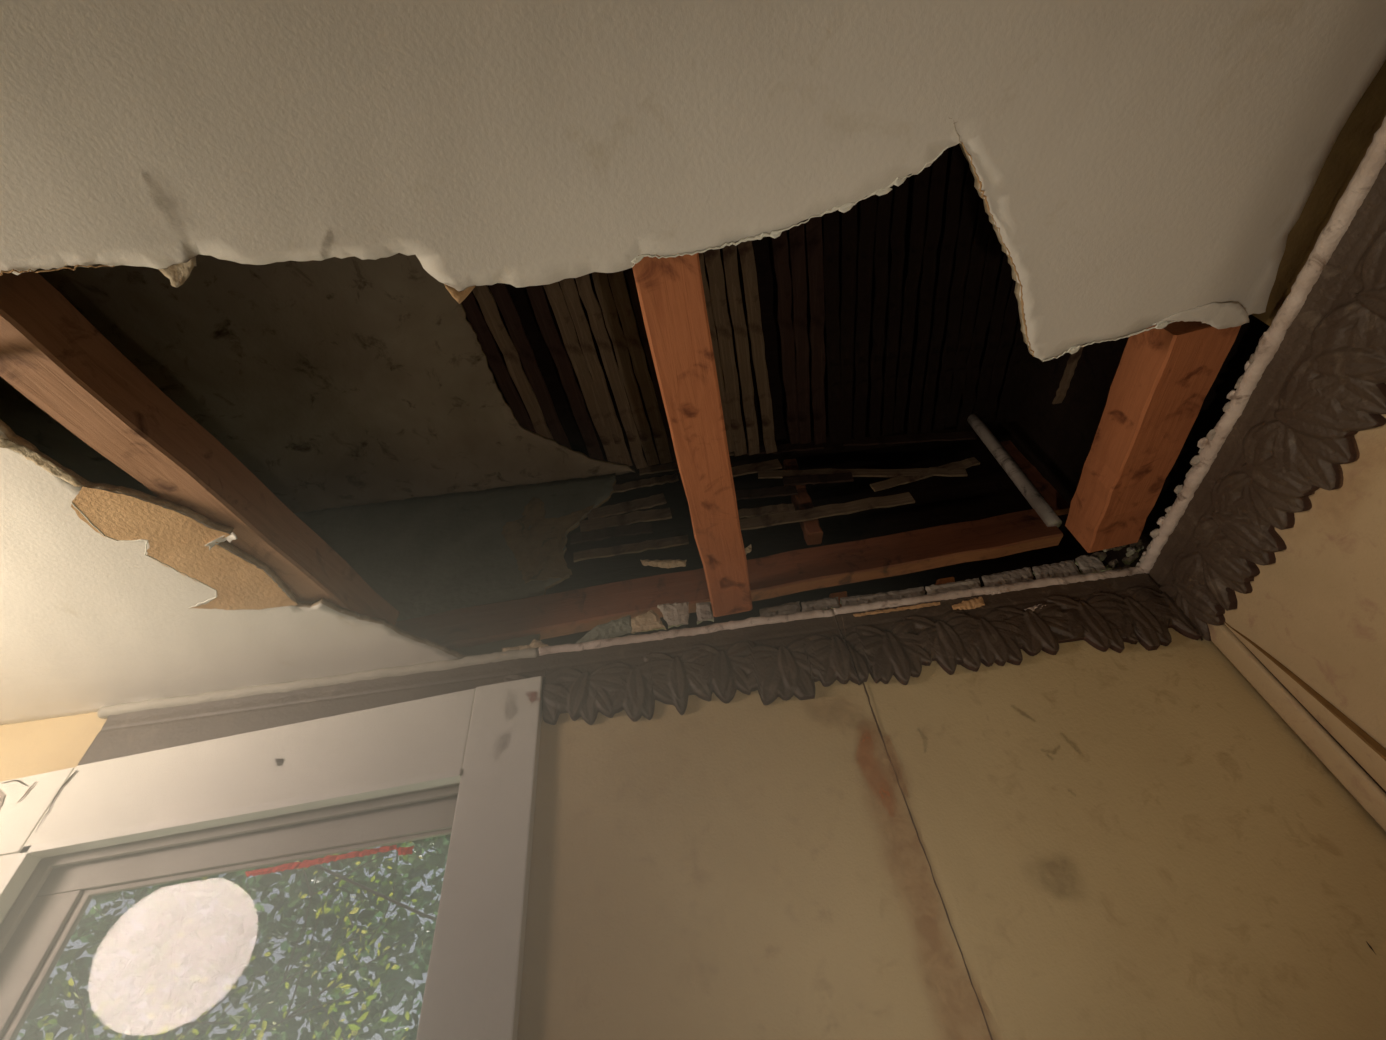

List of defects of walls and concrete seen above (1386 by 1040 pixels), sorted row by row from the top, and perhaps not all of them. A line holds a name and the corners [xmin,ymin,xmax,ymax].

peeling [159,257,195,288]
peeling [444,284,476,304]
spalling [631,142,1176,362]
spalling [1136,331,1269,566]
peeling [71,487,298,610]
spalling [576,602,714,643]
spalling [759,555,1107,617]
crack [862,681,993,1040]